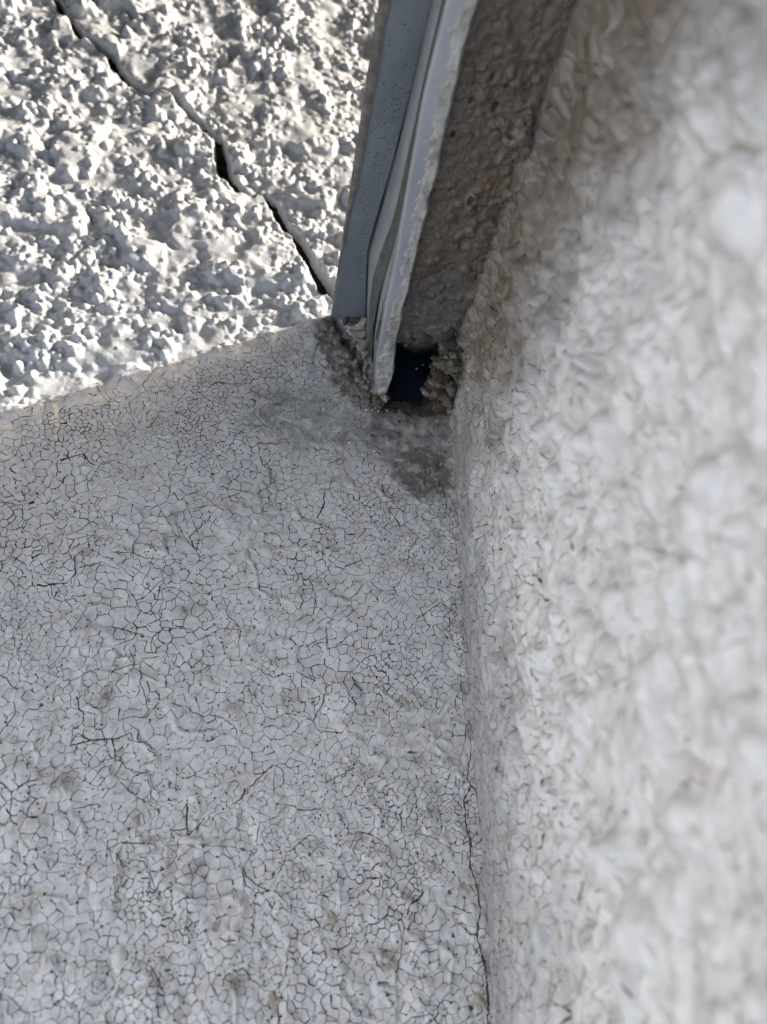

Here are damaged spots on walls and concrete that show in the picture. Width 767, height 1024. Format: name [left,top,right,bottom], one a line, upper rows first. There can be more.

crack [53,0,81,39]
crack [100,52,168,94]
spalling [317,316,391,406]
damp [392,449,451,496]
crack [0,121,684,1024]